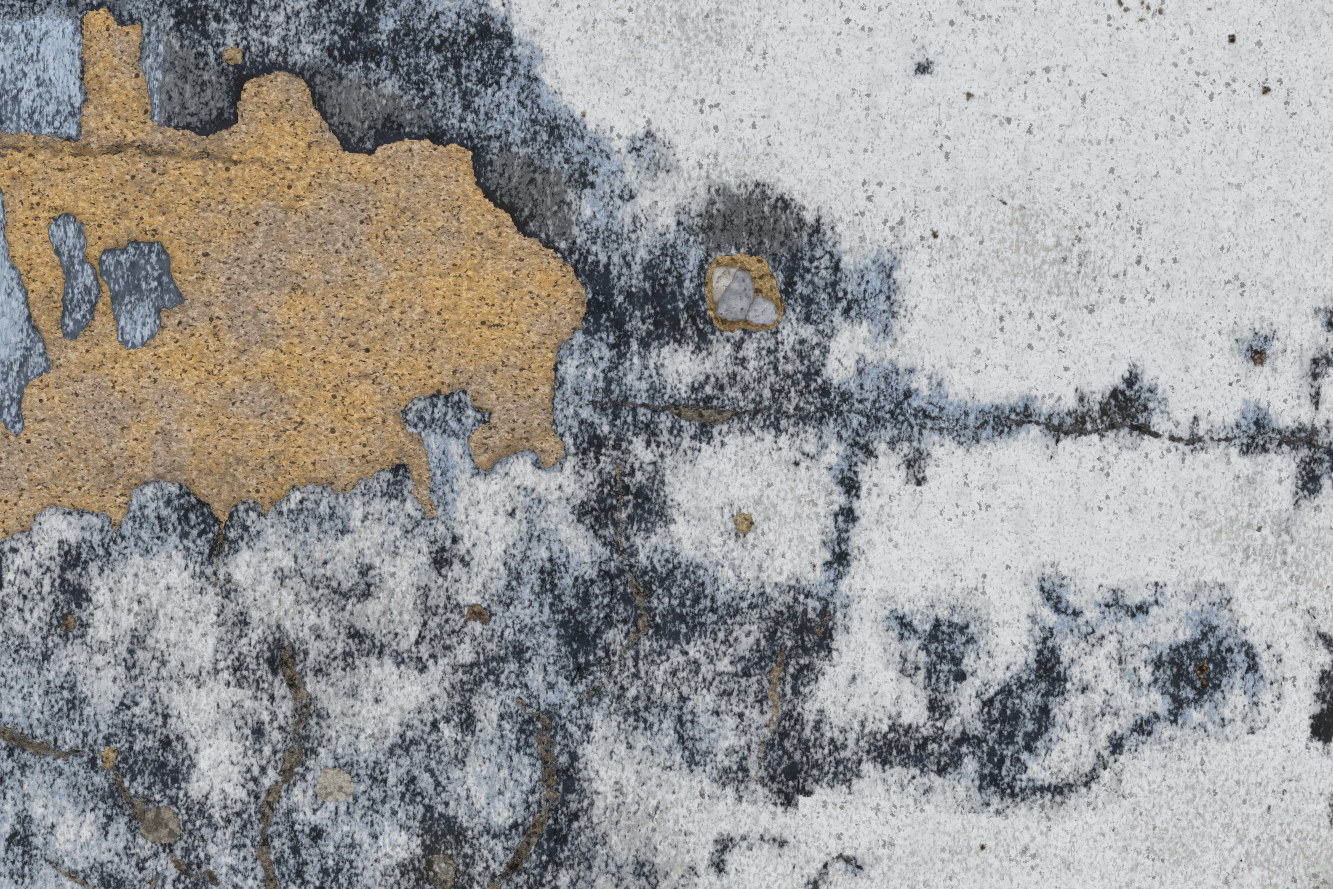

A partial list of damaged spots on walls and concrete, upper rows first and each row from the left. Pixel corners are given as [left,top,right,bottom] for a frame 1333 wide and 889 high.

spalling [0,6,587,543]
spalling [704,252,787,333]
crack [574,312,1333,460]
water stain [1231,323,1287,378]
water stain [1296,340,1333,413]
water stain [1290,598,1333,758]
crack [0,726,86,761]
crack [112,769,153,823]
crack [256,632,311,889]
crack [486,696,561,889]
water stain [671,860,701,889]
water stain [707,817,807,884]